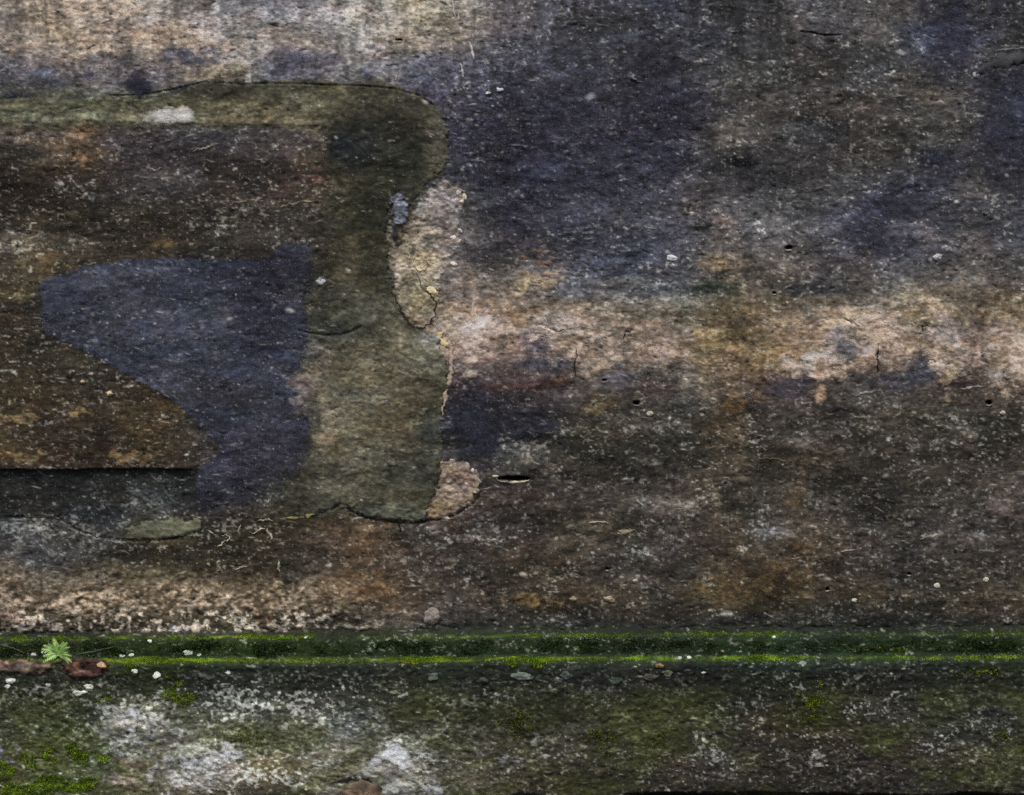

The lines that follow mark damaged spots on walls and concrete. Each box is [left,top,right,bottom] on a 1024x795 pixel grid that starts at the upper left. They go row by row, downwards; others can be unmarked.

leakage [38,243,315,508]
crack [324,497,478,533]
spalling [386,180,467,415]
spalling [425,459,499,520]